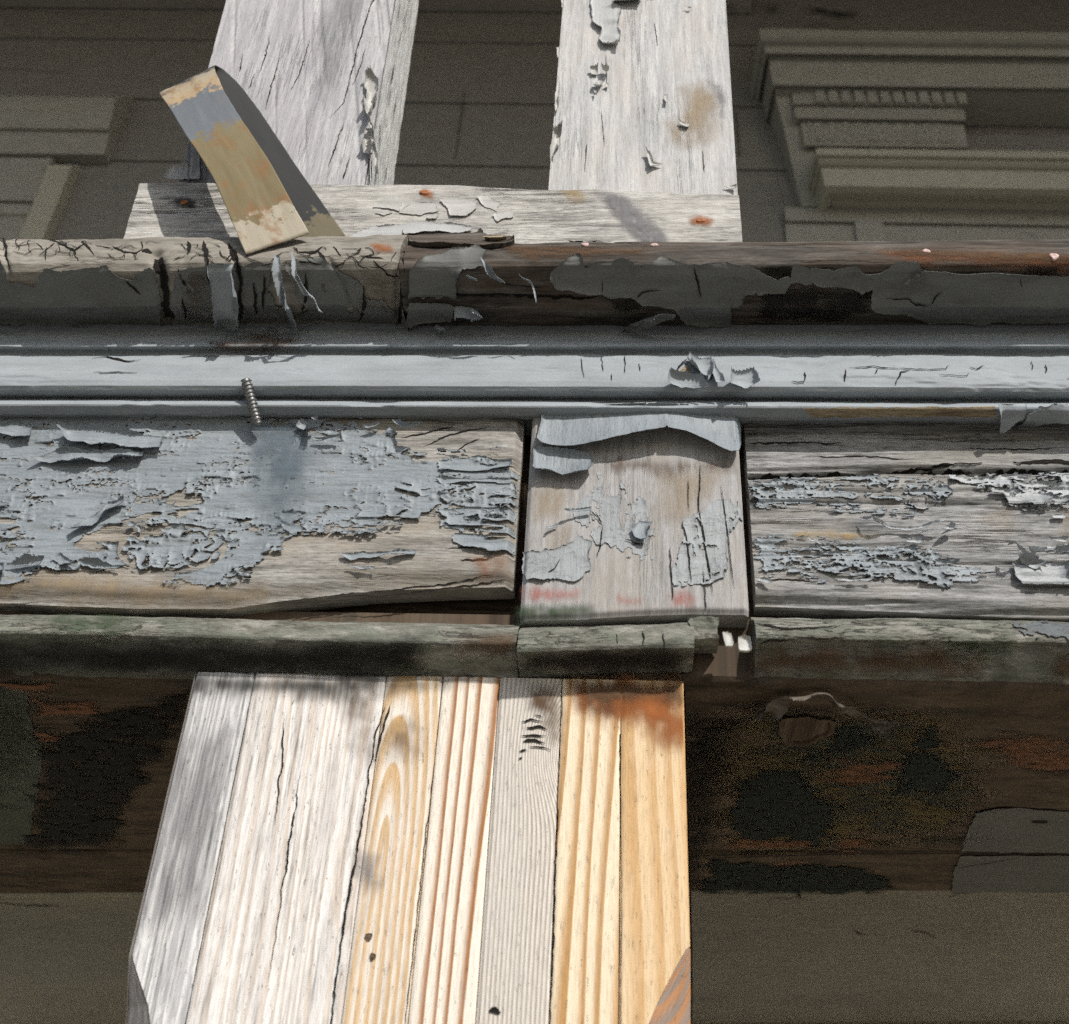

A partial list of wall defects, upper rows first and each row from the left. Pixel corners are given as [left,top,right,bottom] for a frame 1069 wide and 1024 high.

peeling [590,0,625,44]
crack [2,237,405,324]
peeling [0,244,505,335]
crack [456,281,603,300]
crack [551,239,650,247]
peeling [550,253,1069,333]
peeling [668,352,760,388]
peeling [0,402,743,587]
peeling [748,472,1069,587]
damp [687,721,739,885]
crack [268,719,301,980]
crack [330,706,390,1024]